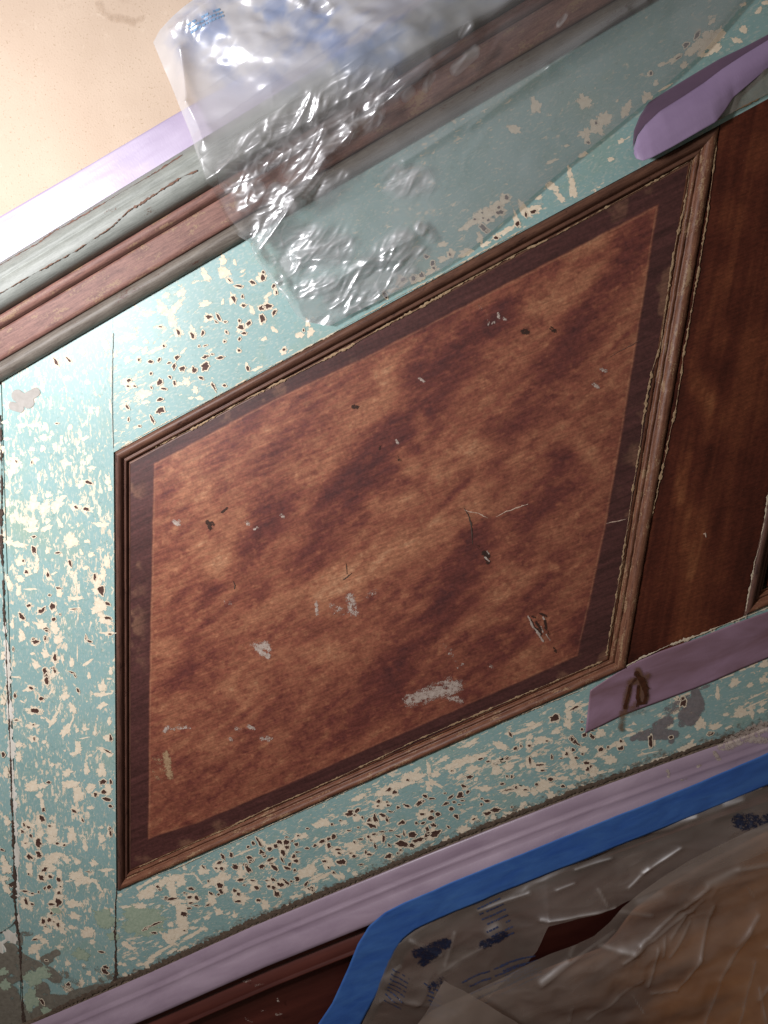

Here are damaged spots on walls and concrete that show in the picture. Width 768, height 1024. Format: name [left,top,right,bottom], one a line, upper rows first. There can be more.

peeling [52,349,90,385]
crack [0,415,765,1023]
peeling [0,401,768,1014]
peeling [102,160,692,867]
peeling [363,17,747,316]
peeling [652,142,717,514]